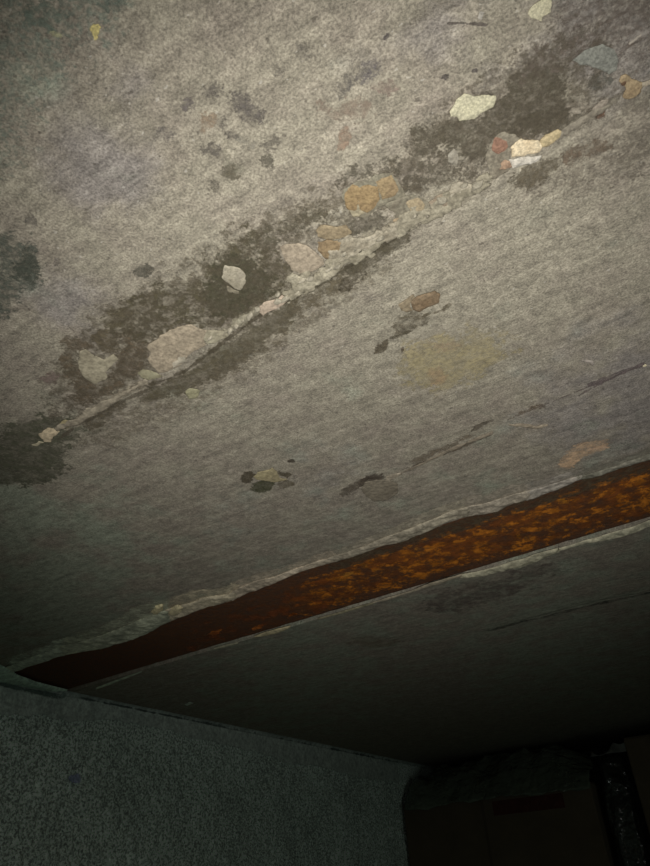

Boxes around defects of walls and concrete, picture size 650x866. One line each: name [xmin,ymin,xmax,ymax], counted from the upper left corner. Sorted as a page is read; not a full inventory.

spalling [450,93,496,121]
spalling [485,129,561,179]
crack [554,94,622,143]
spalling [221,265,246,294]
crack [54,161,494,439]
damp [0,0,650,493]
spalling [280,172,448,273]
spalling [78,349,118,384]
spalling [138,324,229,380]
crack [339,360,647,495]
spalling [5,450,650,672]
corrosion [249,466,650,630]